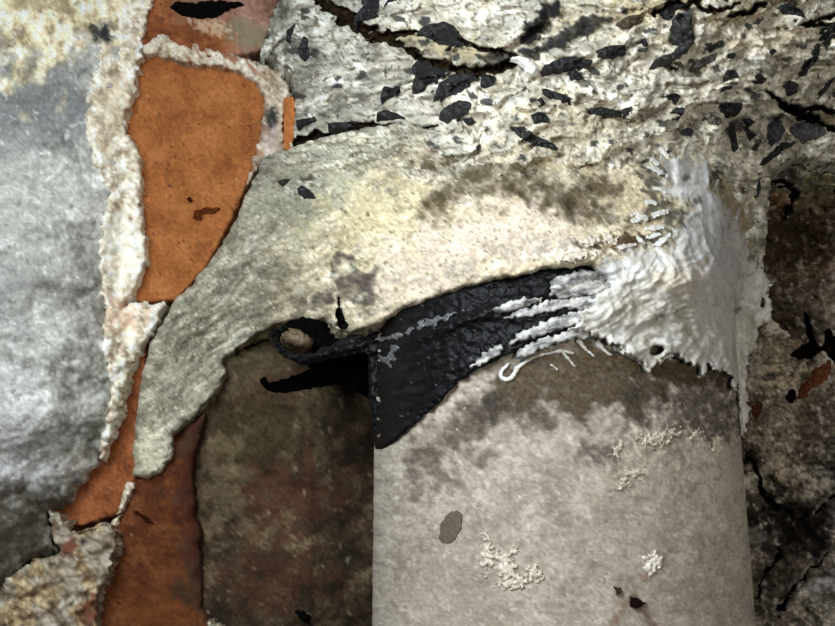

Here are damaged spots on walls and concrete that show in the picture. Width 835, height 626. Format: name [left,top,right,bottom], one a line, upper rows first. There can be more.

spalling [286,23,310,62]
crack [314,0,517,77]
crack [765,90,835,133]
spalling [187,197,220,221]
spalling [297,185,316,199]
crack [744,449,792,515]
crack [814,494,835,514]
crack [756,549,828,618]